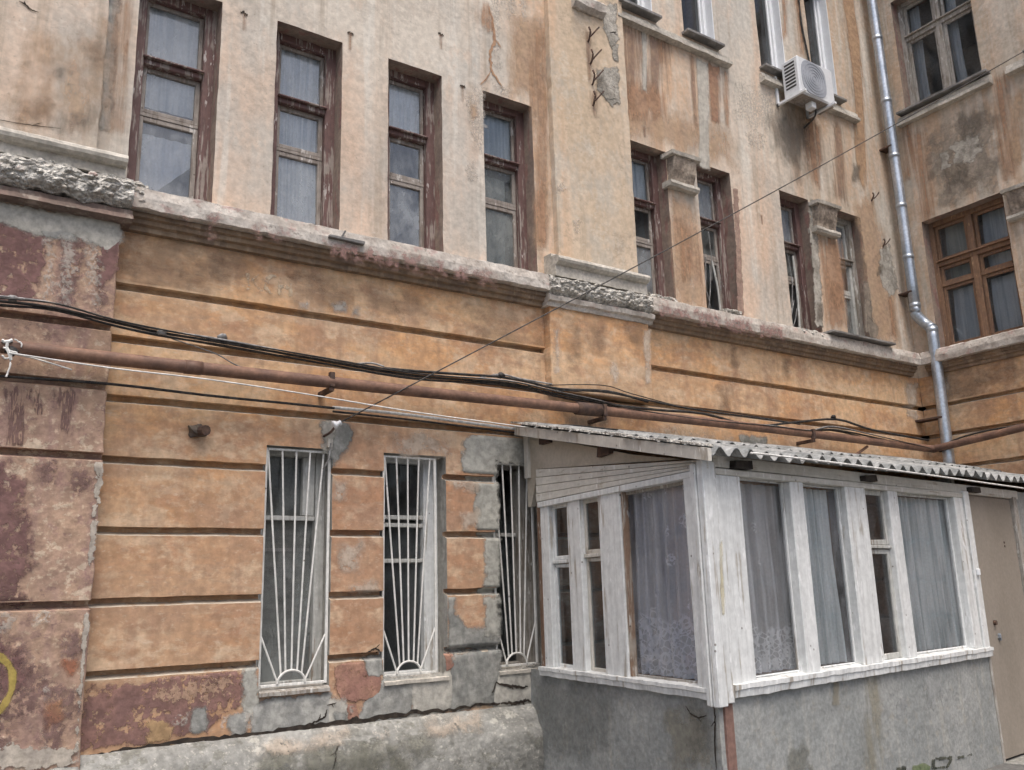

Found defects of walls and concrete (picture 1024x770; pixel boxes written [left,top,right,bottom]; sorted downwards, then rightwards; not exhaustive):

crack [480,7,503,88]
spalling [597,3,621,107]
damp [624,27,729,168]
spalling [0,152,149,210]
spalling [546,189,783,339]
peeling [0,461,35,611]
spalling [69,462,104,566]
peeling [0,612,245,770]
peeling [266,740,302,755]
peeling [321,662,382,744]